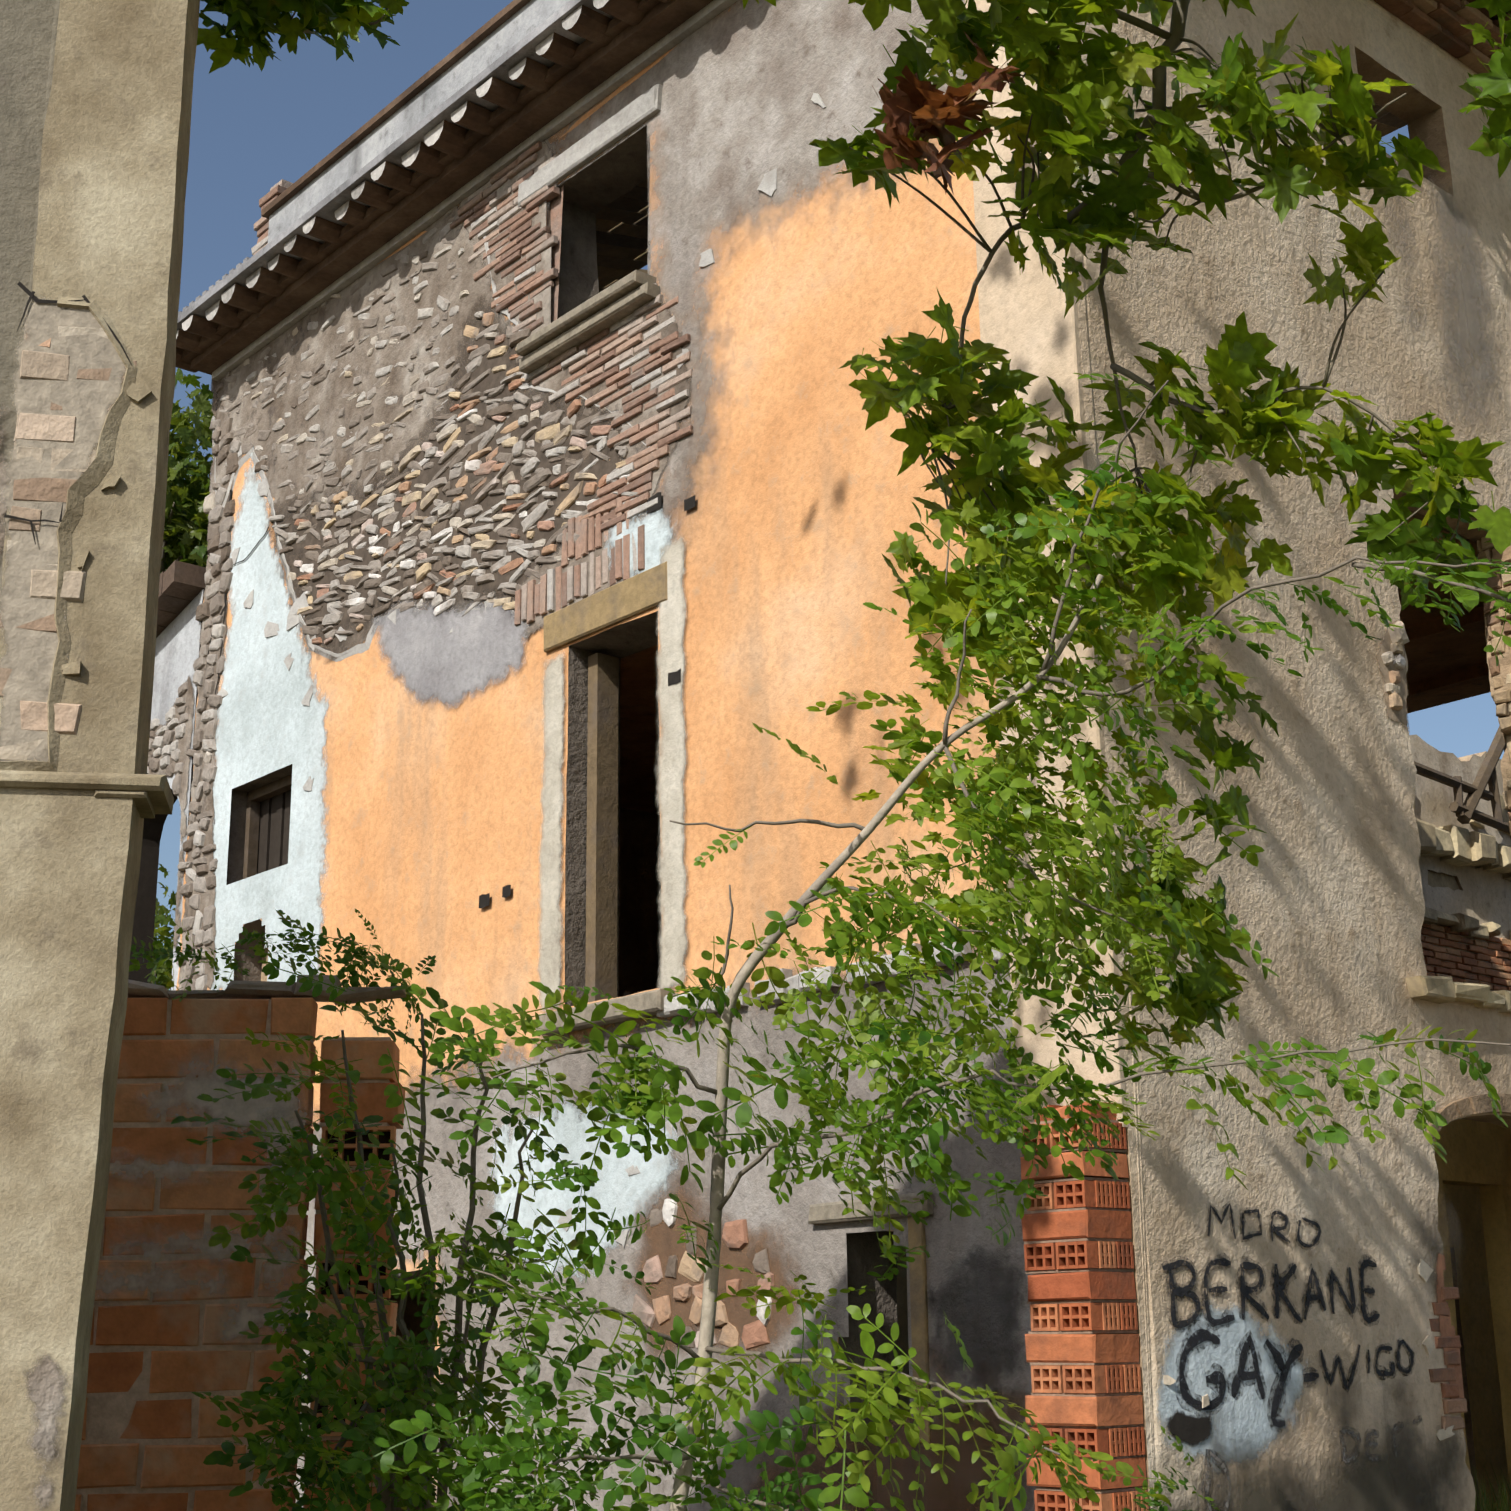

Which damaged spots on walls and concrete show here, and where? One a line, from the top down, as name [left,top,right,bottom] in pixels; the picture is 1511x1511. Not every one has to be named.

spalling [0,296,152,772]
spalling [147,141,693,990]
spalling [1377,621,1410,729]
spalling [491,1102,797,1352]
spalling [1417,1253,1467,1441]